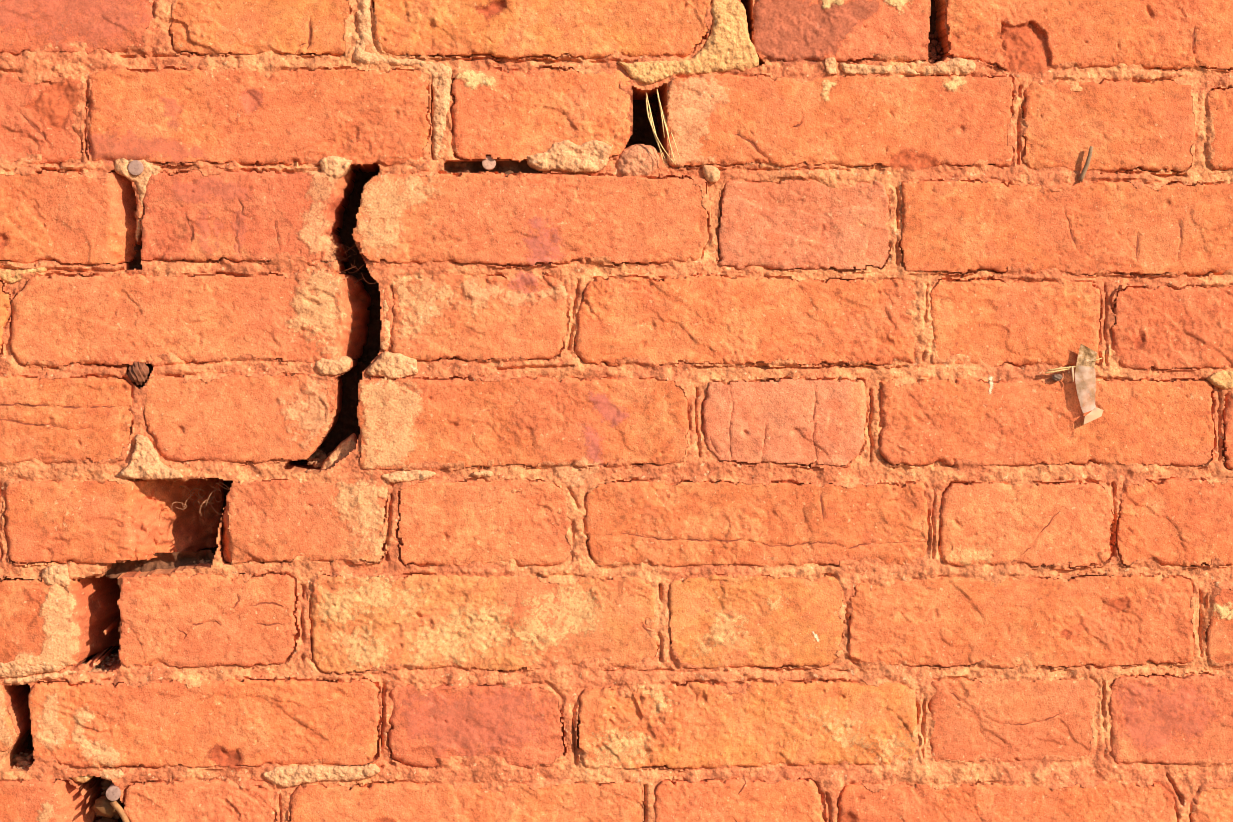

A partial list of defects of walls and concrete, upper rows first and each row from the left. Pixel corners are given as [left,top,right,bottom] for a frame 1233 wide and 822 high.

crack [624,94,658,151]
crack [444,159,542,177]
crack [235,198,281,257]
crack [292,168,382,464]
crack [0,403,115,430]
crack [221,480,233,516]
crack [105,547,218,578]
crack [178,595,286,639]
crack [102,646,120,656]
crack [25,728,34,750]